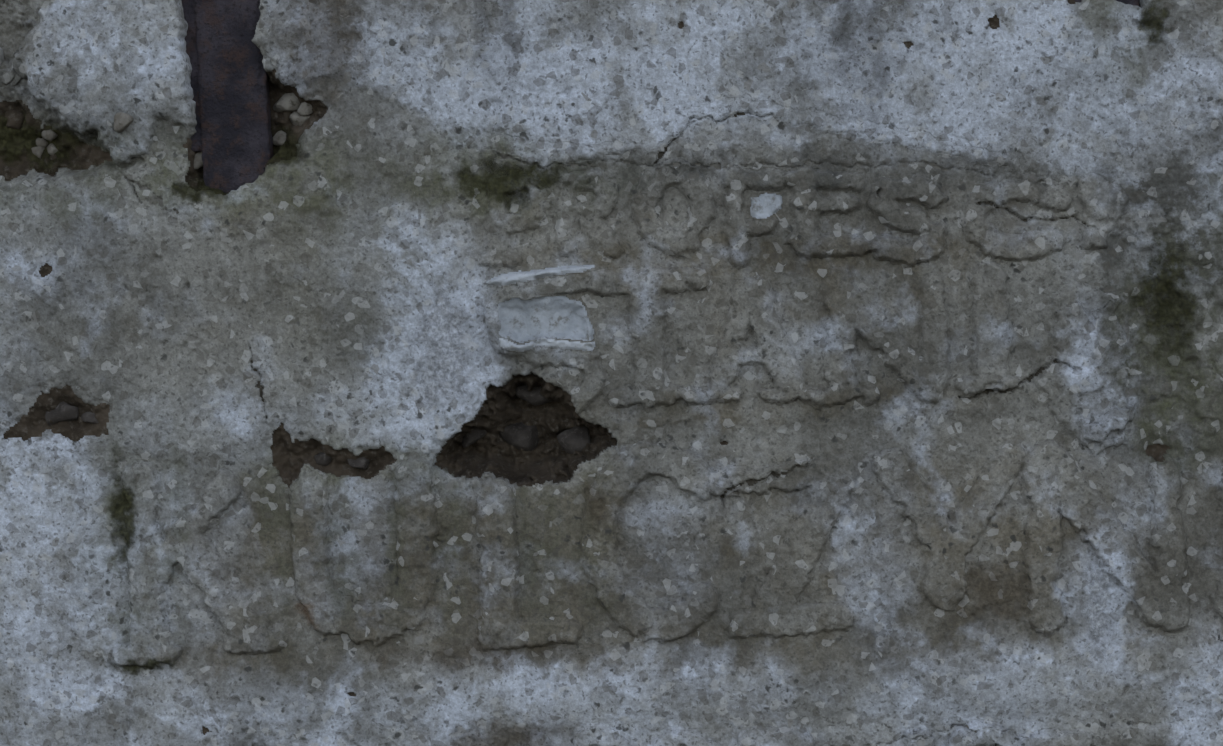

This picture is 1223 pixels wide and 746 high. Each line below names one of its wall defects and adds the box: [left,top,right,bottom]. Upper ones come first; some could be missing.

spalling [0,0,113,181]
spalling [3,384,110,441]